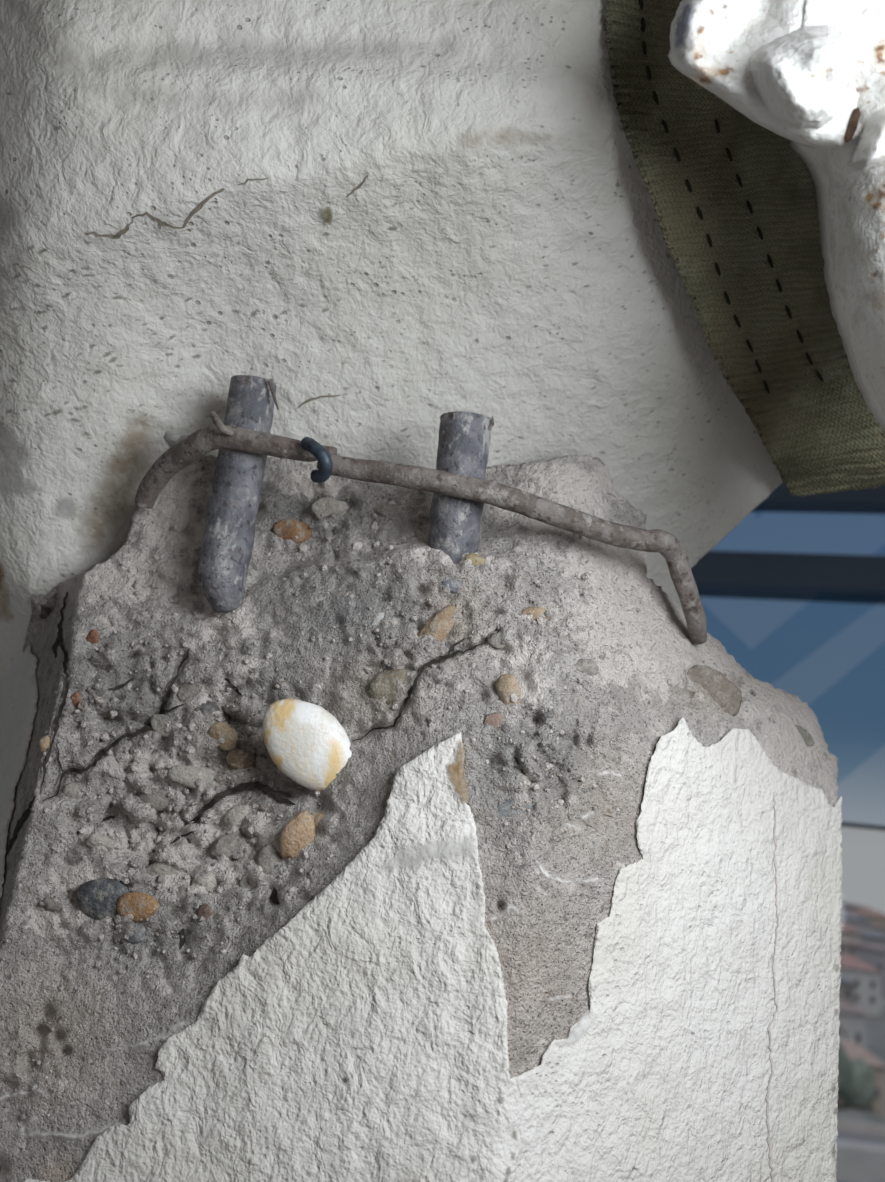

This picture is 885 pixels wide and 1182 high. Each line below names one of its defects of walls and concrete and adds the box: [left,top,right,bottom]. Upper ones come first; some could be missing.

crack [85,178,267,239]
crack [347,176,368,197]
spalling [223,375,279,433]
spalling [436,411,646,529]
crack [6,592,189,854]
crack [225,678,241,696]
crack [352,630,499,742]
crack [170,781,296,844]
spalling [0,448,839,1182]
crack [766,791,779,1182]